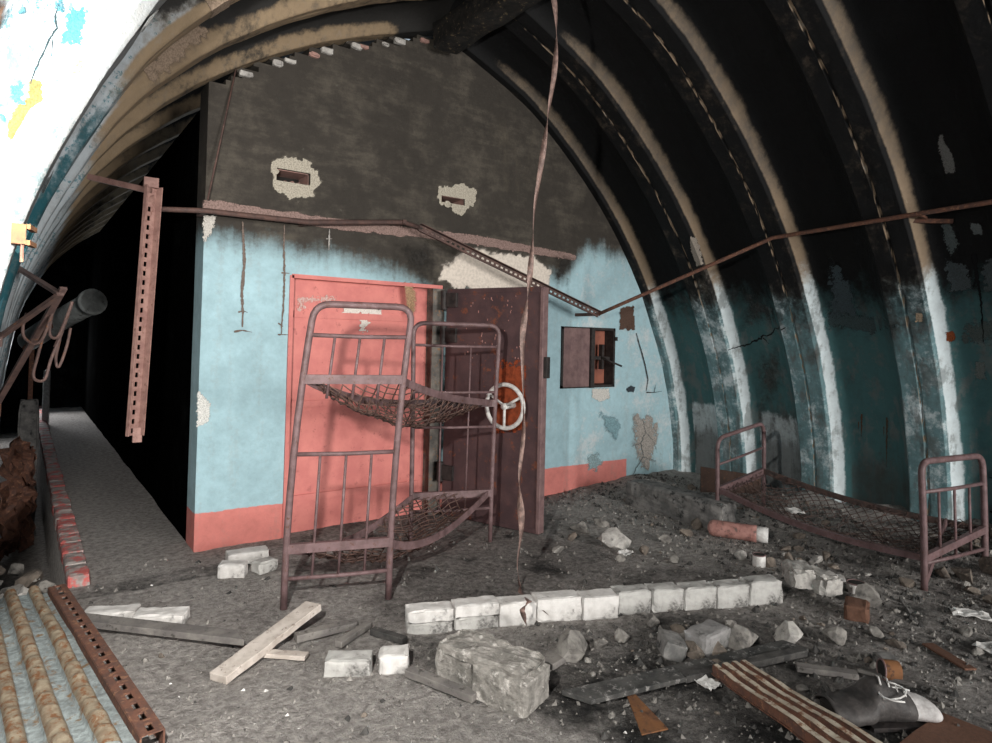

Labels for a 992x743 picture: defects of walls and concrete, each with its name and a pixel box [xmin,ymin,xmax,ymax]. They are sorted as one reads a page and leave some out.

crack [30,1,59,84]
peeling [17,0,89,46]
flaking render [144,0,234,82]
flaking render [0,79,43,140]
flaking render [271,156,321,200]
flaking render [437,183,477,216]
flaking render [439,235,551,358]
corrosion [494,359,526,434]
flaking render [633,413,658,470]